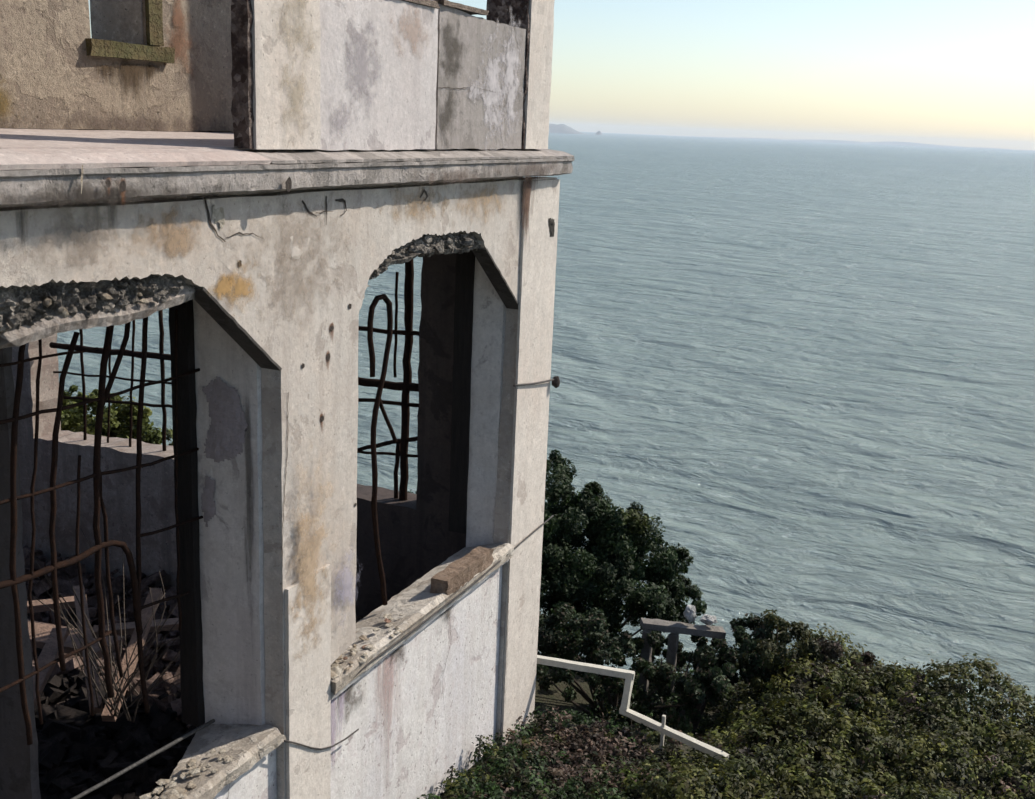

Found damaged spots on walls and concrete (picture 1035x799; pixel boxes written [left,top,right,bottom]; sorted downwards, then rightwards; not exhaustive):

crack [187,194,262,242]
crack [302,196,347,225]
spalling [357,232,481,501]
spalling [0,275,248,745]
spalling [331,613,403,679]
spalling [139,749,234,799]